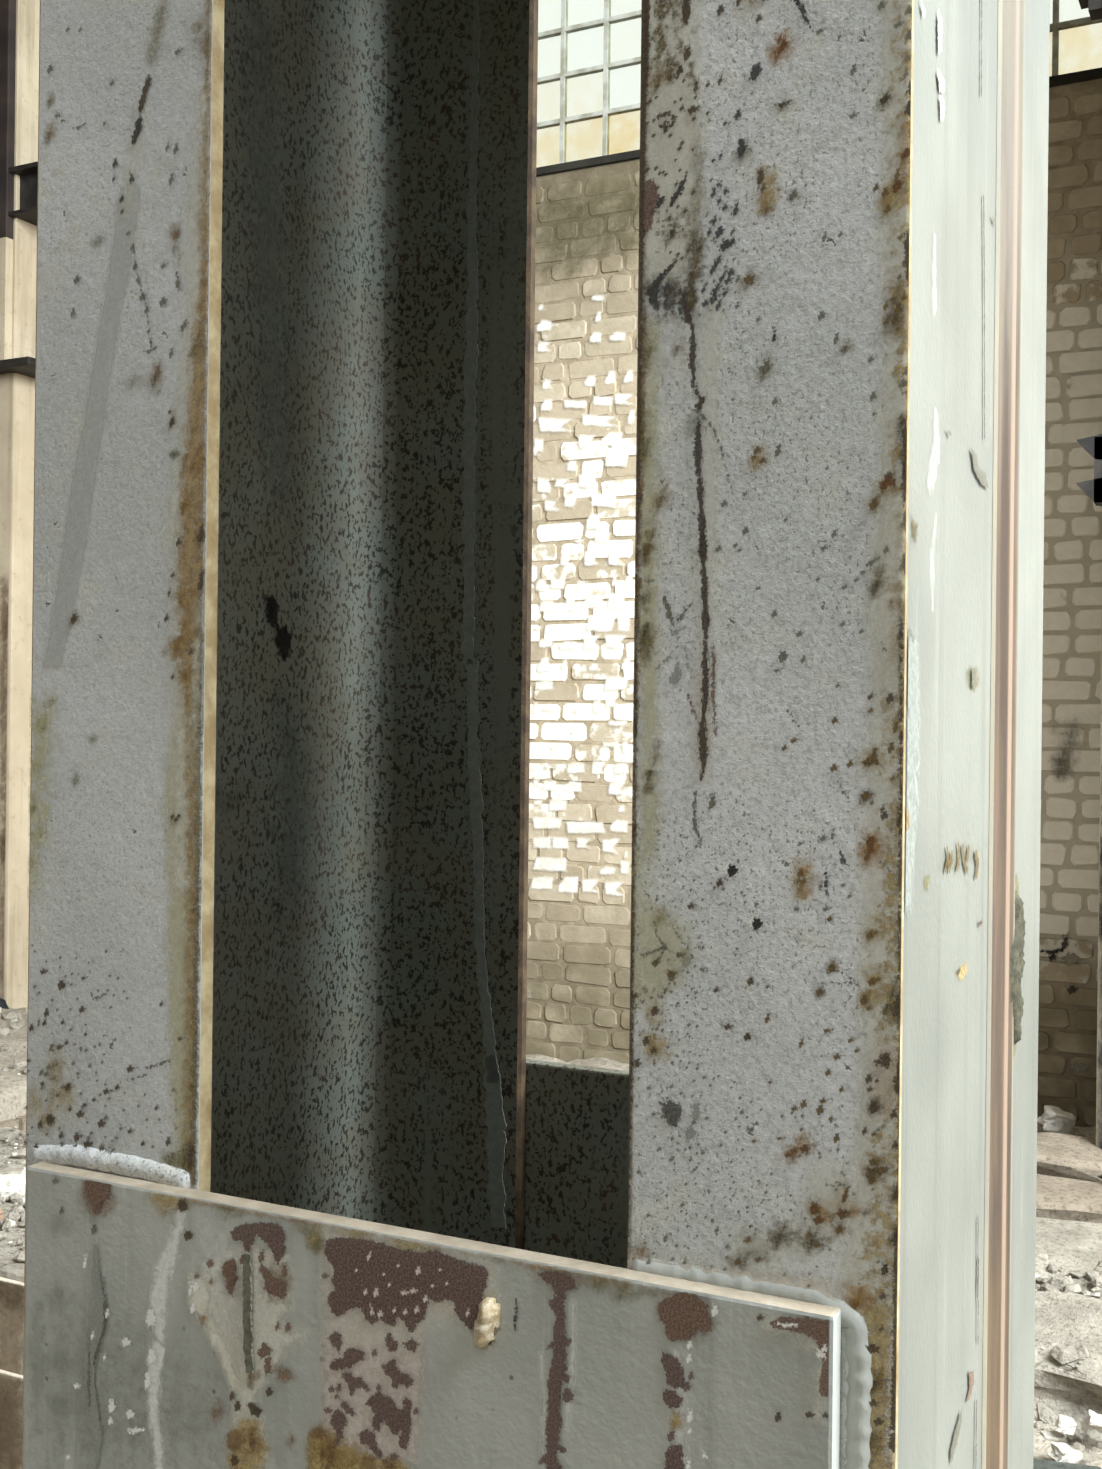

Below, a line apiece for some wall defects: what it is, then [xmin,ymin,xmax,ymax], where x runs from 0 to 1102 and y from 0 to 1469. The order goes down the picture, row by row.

corrosion [716,0,765,23]
corrosion [151,0,212,1214]
corrosion [627,0,722,1263]
crack [682,297,737,849]
corrosion [728,0,912,1469]
corrosion [687,878,747,929]
peeling [83,1245,110,1469]
corrosion [212,1391,269,1469]
peeling [194,1222,306,1469]
corrosion [290,1428,407,1469]
peeling [321,1236,490,1461]